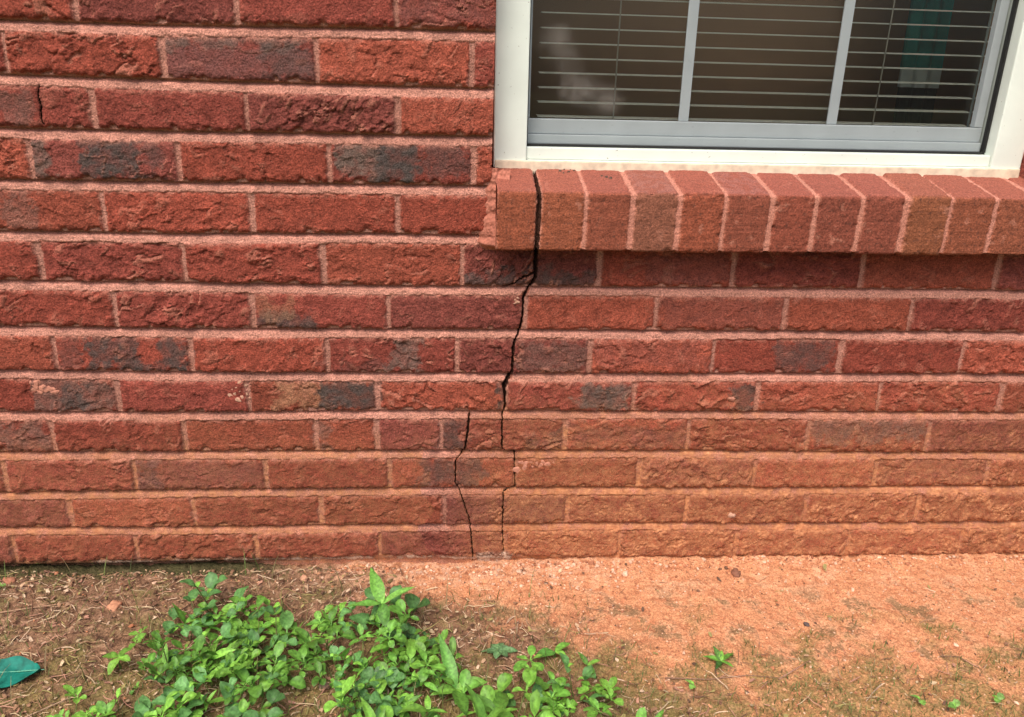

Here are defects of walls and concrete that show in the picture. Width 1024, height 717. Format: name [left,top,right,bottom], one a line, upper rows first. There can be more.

crack [455,412,473,560]
crack [501,172,541,549]